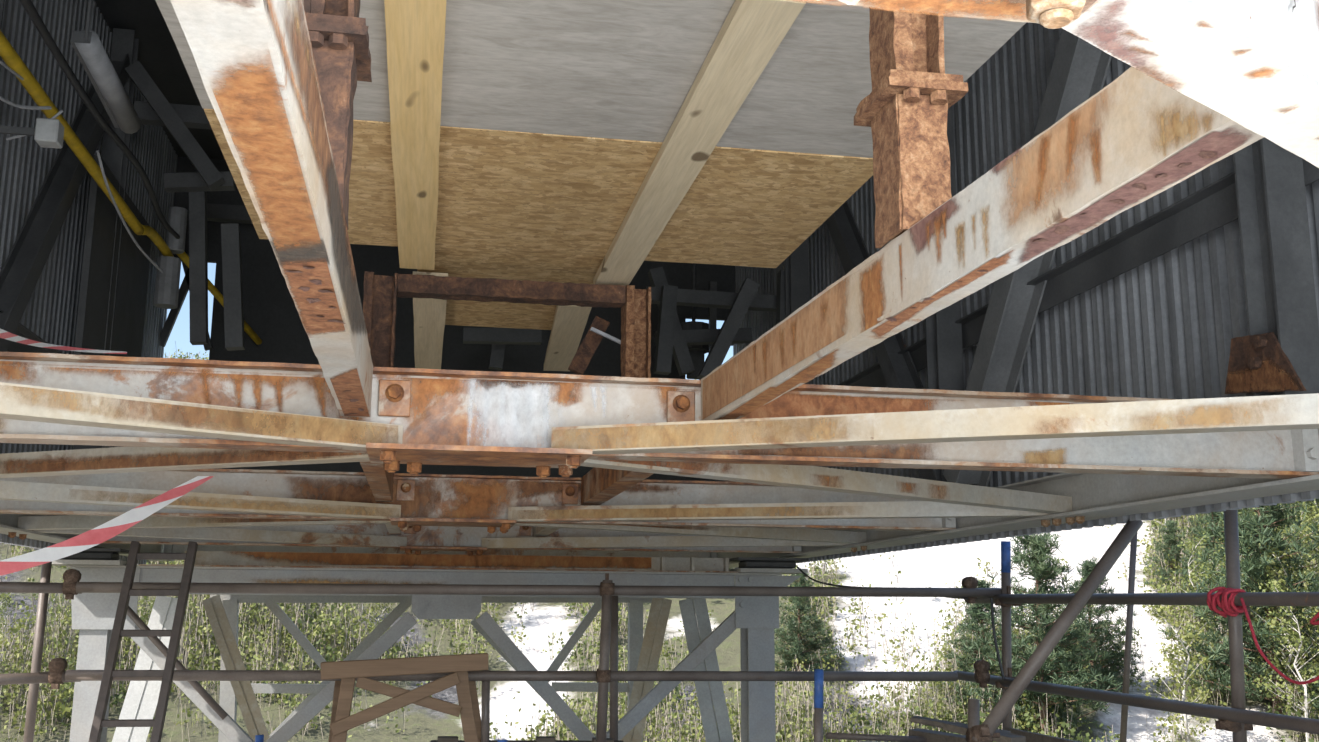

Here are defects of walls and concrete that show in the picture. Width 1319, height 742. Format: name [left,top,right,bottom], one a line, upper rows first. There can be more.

corrosion [798,0,1026,19]
corrosion [1078,0,1180,90]
corrosion [1248,69,1274,78]
corrosion [213,0,356,279]
corrosion [899,198,988,296]
corrosion [0,361,386,474]
corrosion [564,259,933,471]
corrosion [1025,449,1064,464]
corrosion [1144,358,1298,430]
corrosion [119,478,831,530]